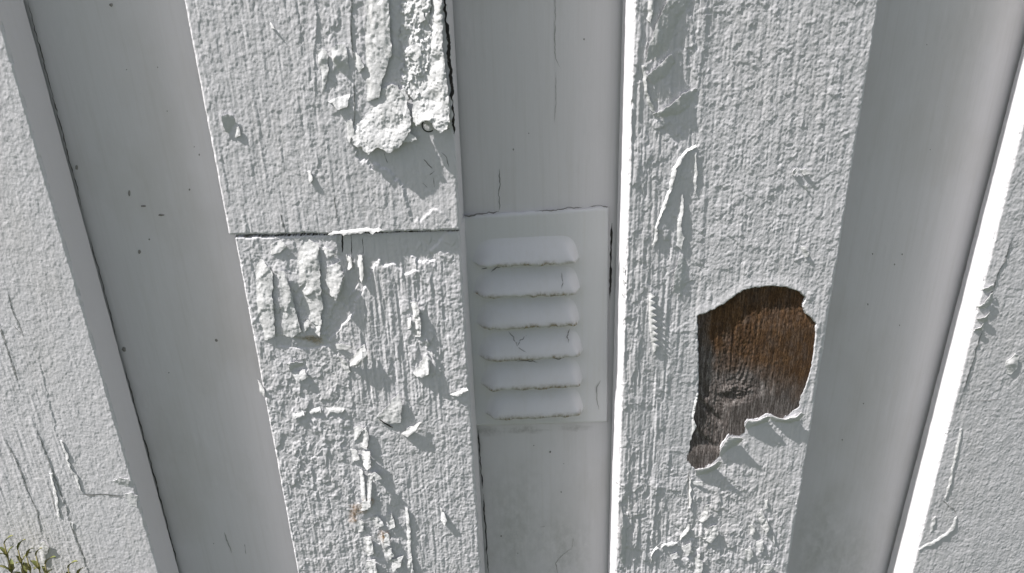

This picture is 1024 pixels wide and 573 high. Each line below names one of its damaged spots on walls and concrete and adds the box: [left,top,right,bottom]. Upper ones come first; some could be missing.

peeling [328,0,450,154]
peeling [640,0,697,118]
crack [465,170,501,217]
peeling [652,145,698,296]
peeling [287,361,308,382]
peeling [255,227,383,340]
peeling [293,406,345,418]
peeling [407,302,432,378]
peeling [687,286,816,508]
peeling [350,394,421,573]
peeling [651,504,718,573]